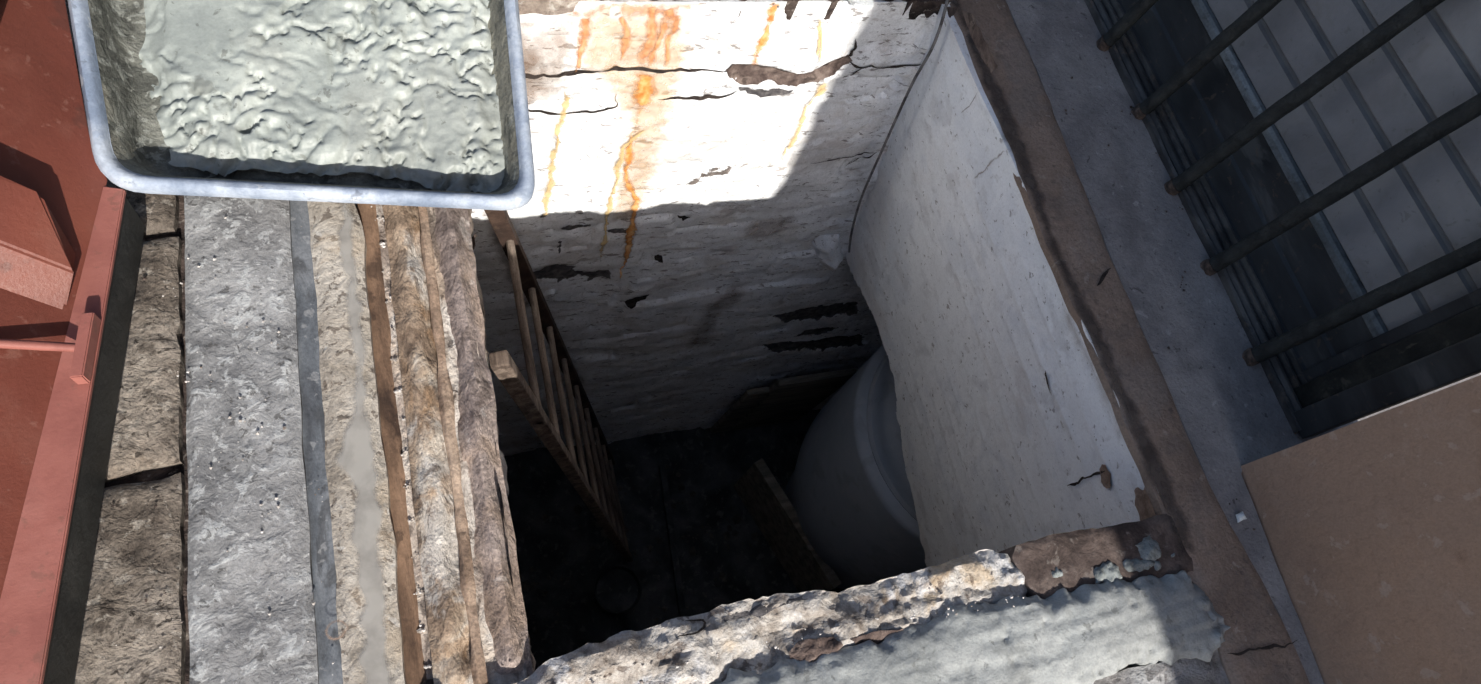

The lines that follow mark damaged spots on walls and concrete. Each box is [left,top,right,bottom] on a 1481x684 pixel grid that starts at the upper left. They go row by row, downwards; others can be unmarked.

rust [574,4,689,107]
rust [754,3,779,64]
spalling [726,55,852,98]
rust [542,97,570,215]
rust [782,84,826,160]
rust [600,131,643,278]
peeling [534,211,626,282]
peeling [764,302,864,353]
crack [1228,640,1297,656]